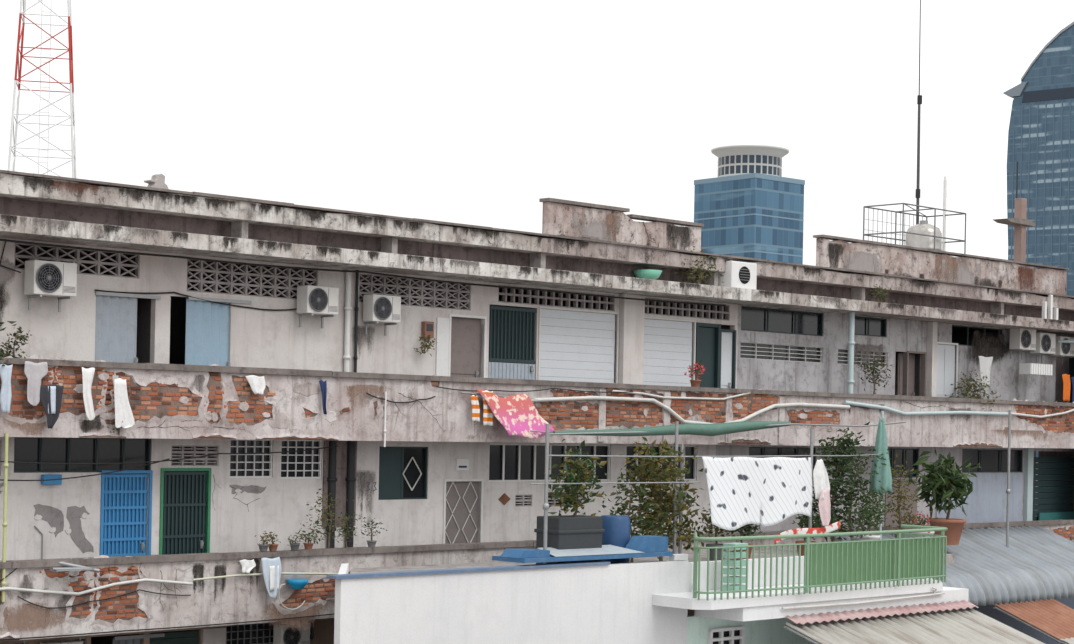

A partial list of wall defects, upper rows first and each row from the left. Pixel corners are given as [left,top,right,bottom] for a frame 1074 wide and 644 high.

leakage [24,177,98,194]
leakage [119,188,235,208]
leakage [348,215,423,230]
leakage [453,227,499,239]
leakage [667,224,691,248]
leakage [793,243,844,274]
leakage [975,267,1035,299]
flaking render [0,355,339,440]
flaking render [335,400,351,421]
flaking render [33,504,153,627]
flaking render [0,560,20,642]
flaking render [273,567,353,615]